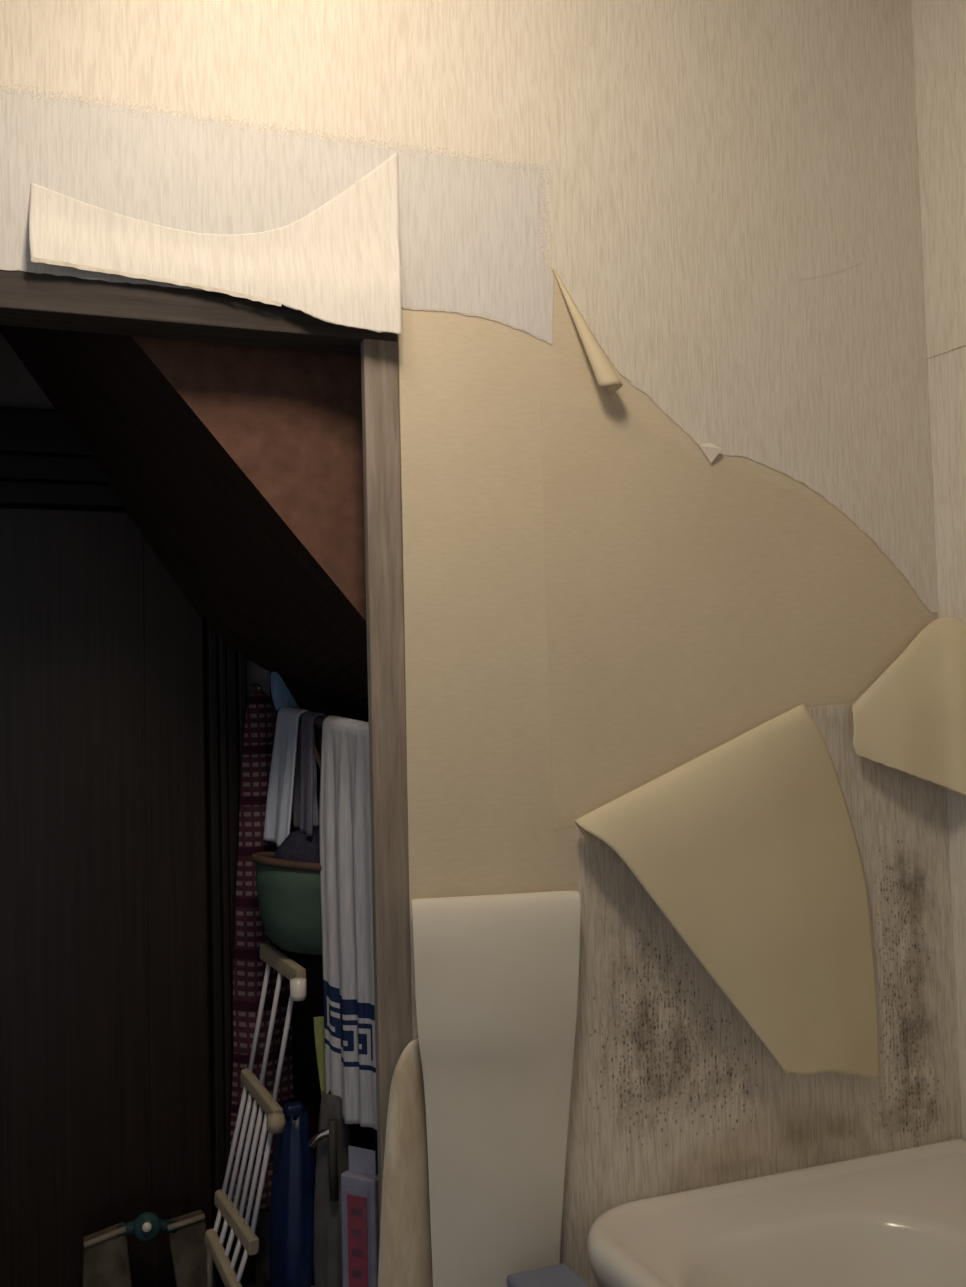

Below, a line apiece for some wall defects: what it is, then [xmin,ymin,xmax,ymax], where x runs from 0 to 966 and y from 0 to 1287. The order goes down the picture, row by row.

peeling [399,268,938,900]